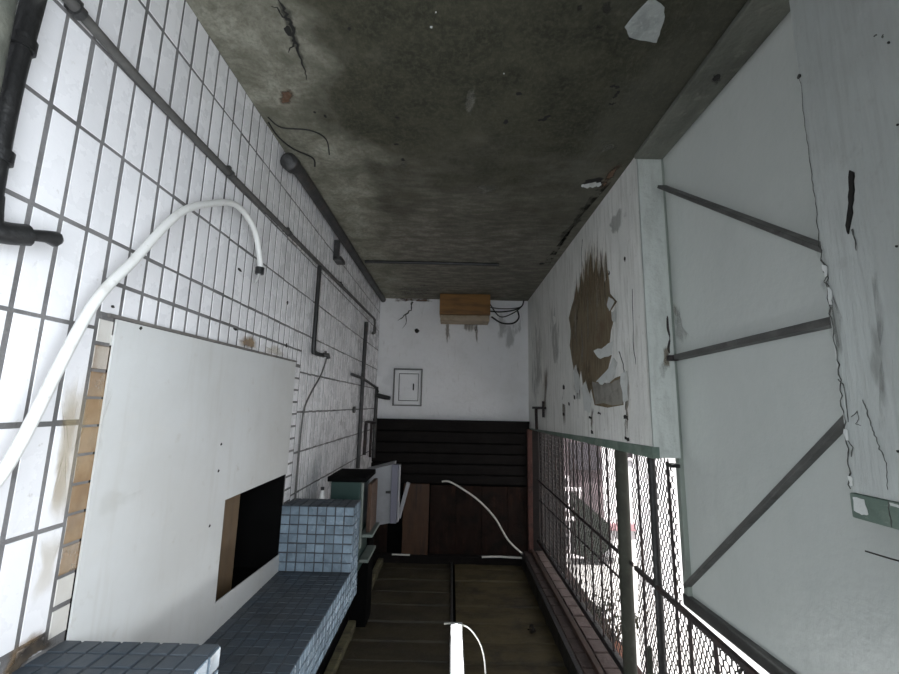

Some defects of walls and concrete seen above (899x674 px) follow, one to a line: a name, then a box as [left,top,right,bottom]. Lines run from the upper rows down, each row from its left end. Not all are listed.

crack [271,0,307,80]
corrosion [280,90,292,103]
peeling [569,250,628,413]
crack [799,79,892,528]
peeling [853,497,868,515]